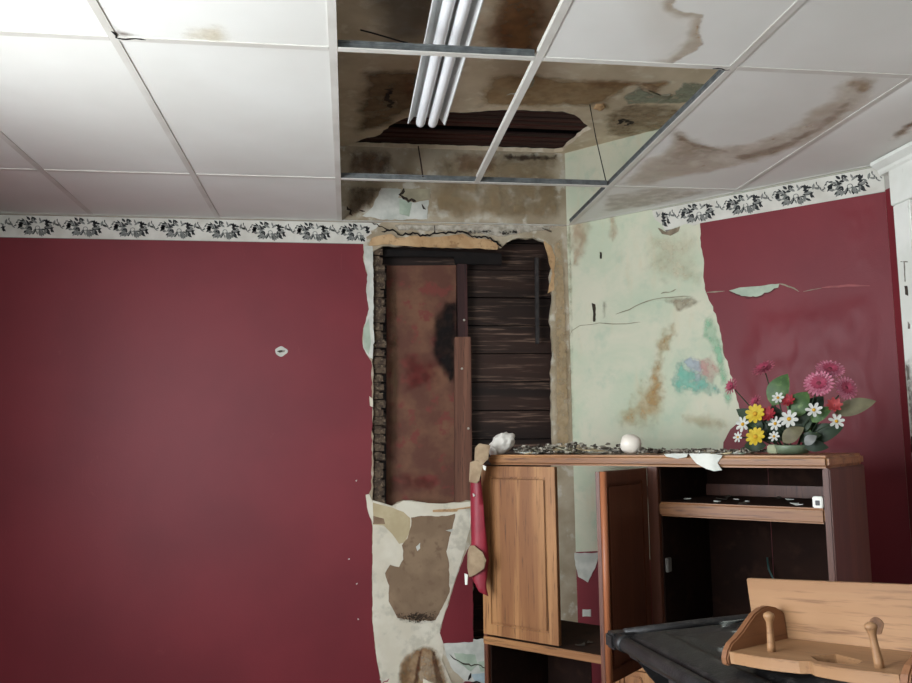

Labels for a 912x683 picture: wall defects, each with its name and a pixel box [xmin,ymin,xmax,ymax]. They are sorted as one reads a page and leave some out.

peeling [347,188,430,220]
crack [373,223,502,247]
peeling [676,347,722,391]
flaking render [444,639,485,683]